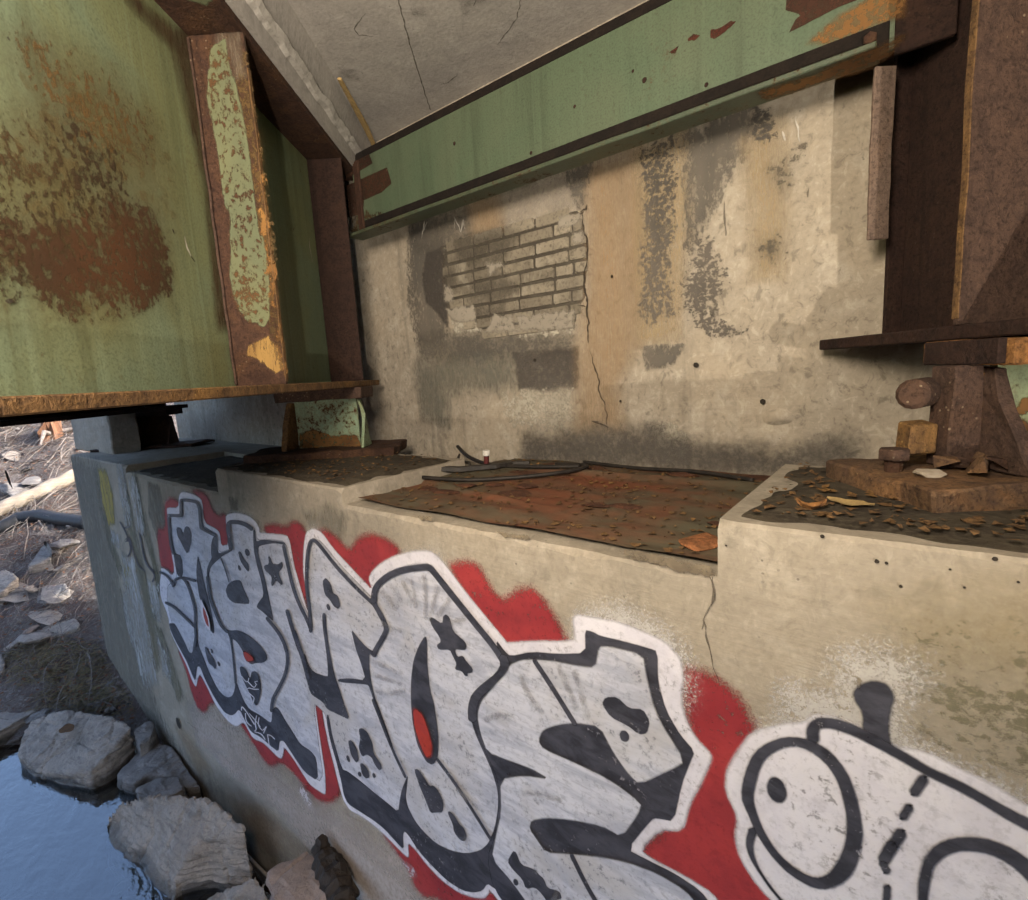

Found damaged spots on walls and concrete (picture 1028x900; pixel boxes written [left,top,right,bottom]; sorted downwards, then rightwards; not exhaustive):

crack [398,0,457,110]
peeling [670,21,736,54]
corrosion [812,0,906,43]
corrosion [0,21,173,323]
corrosion [131,0,289,381]
spalling [440,208,589,339]
crack [580,205,609,428]
water stain [405,213,852,474]
water stain [637,106,778,340]
crack [721,201,729,236]
corrosion [233,430,443,479]
crack [702,577,719,683]